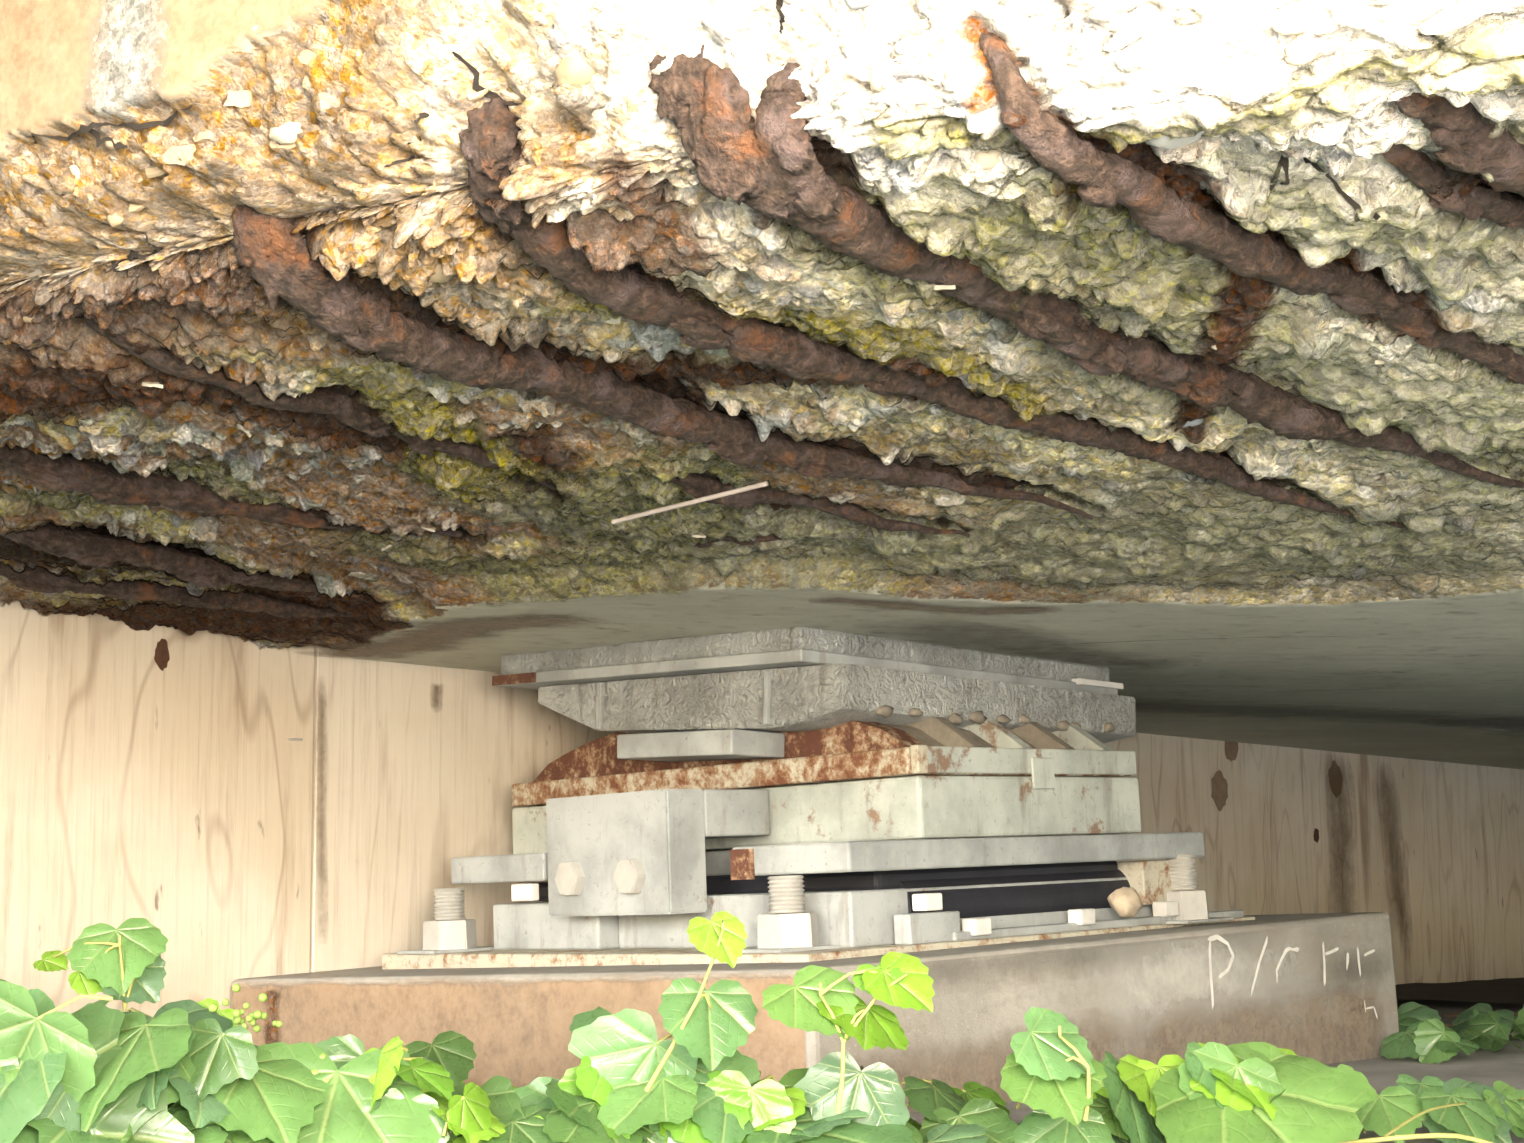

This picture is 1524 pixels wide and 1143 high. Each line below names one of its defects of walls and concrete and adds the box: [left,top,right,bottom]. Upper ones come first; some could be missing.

spalling [0,0,1524,651]
rust [0,522,581,657]
rust [694,534,782,548]
rust [825,599,1049,615]